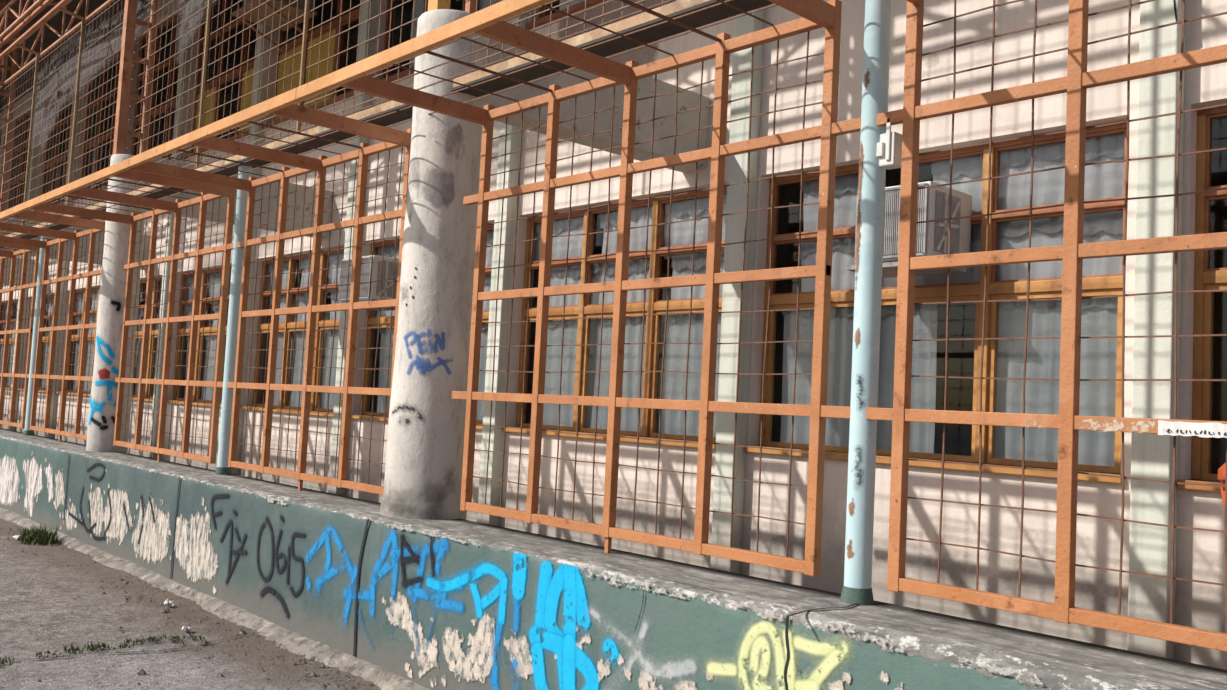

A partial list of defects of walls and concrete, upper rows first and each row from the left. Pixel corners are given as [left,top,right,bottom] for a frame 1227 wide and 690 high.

rust [855,142,864,290]
spalling [725,599,783,622]
peeling [382,591,533,688]
peeling [575,626,591,650]
crack [784,603,858,690]
spalling [823,621,904,653]
peeling [827,672,851,690]
spalling [958,656,1043,685]